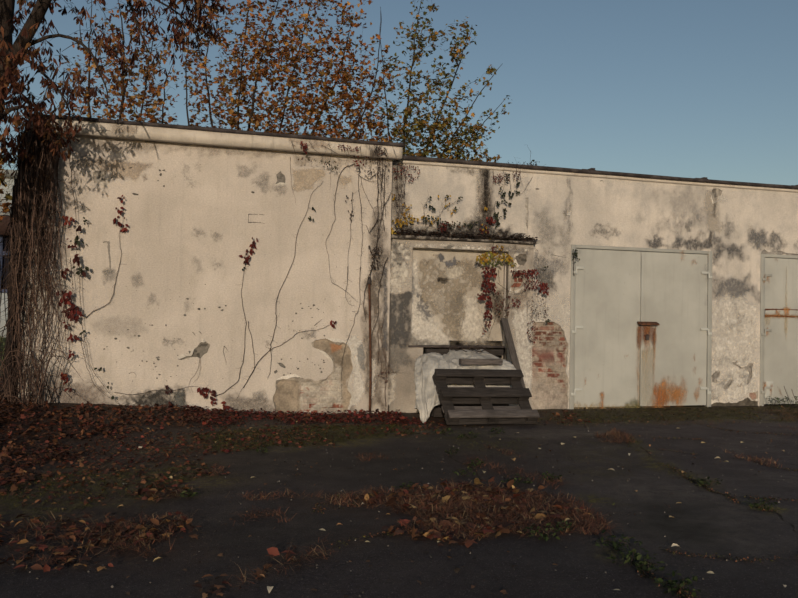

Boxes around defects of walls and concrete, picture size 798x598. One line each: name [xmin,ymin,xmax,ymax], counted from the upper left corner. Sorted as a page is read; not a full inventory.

damp [391,161,520,243]
damp [673,191,742,260]
damp [749,232,782,250]
spalling [139,338,210,379]
flaking render [273,303,365,415]
damp [364,213,412,410]
flaking render [390,242,570,410]
corrosion [638,326,656,354]
damp [712,277,754,300]
corrosion [654,380,685,408]